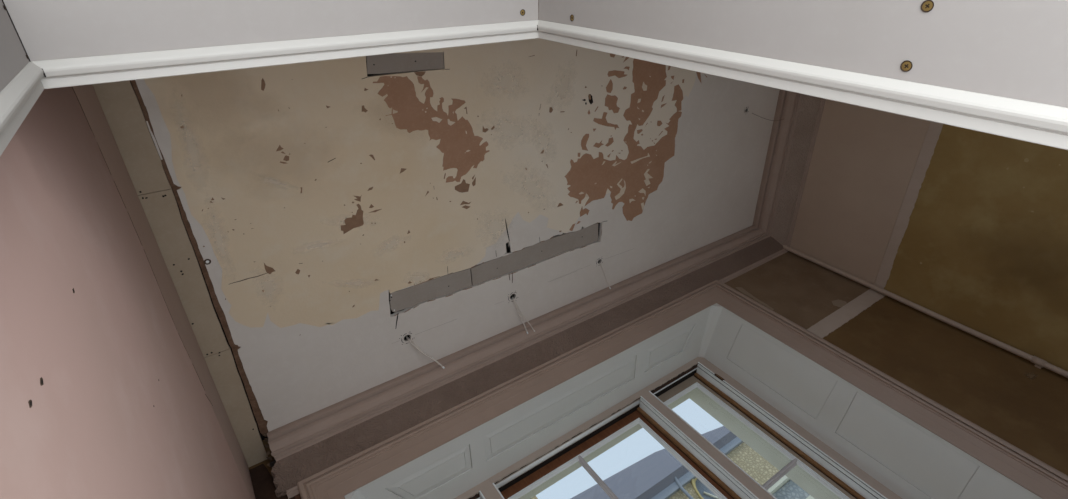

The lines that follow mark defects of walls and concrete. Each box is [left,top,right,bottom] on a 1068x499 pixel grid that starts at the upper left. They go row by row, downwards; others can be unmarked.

peeling [130,38,707,499]